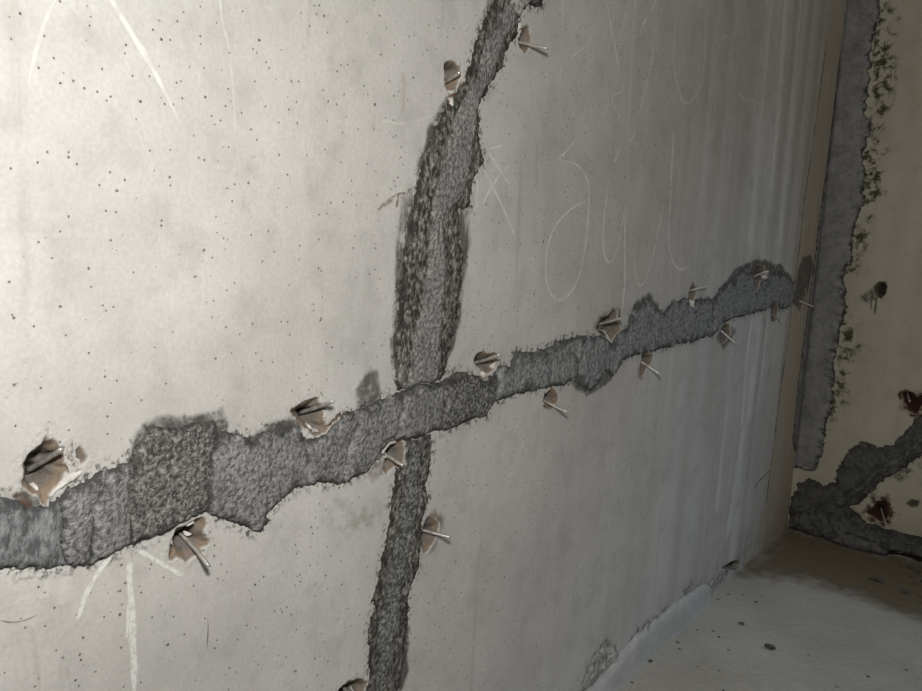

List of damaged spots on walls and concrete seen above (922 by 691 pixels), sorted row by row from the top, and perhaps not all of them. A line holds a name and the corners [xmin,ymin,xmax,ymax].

crack [0,261,795,691]
crack [391,0,543,391]
damp [745,0,922,614]
crack [788,414,922,562]